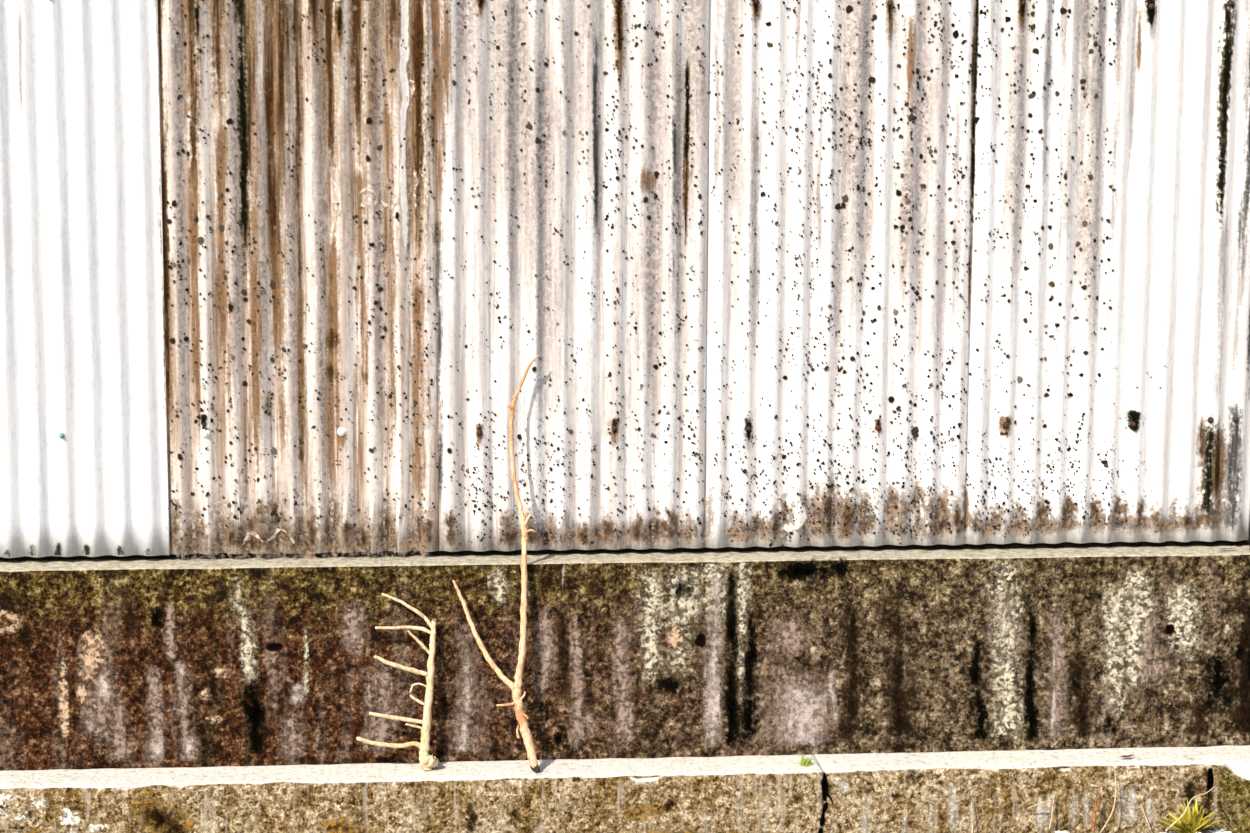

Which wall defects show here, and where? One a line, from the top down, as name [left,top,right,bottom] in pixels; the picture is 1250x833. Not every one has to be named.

rust [334,6,343,51]
water stain [637,0,759,374]
water stain [901,0,993,337]
water stain [1216,0,1250,371]
water stain [498,389,1250,547]
water stain [777,558,848,583]
water stain [59,658,69,738]
water stain [147,605,198,760]
water stain [536,608,595,748]
water stain [703,573,760,747]
water stain [1023,603,1116,740]
crack [818,772,833,833]